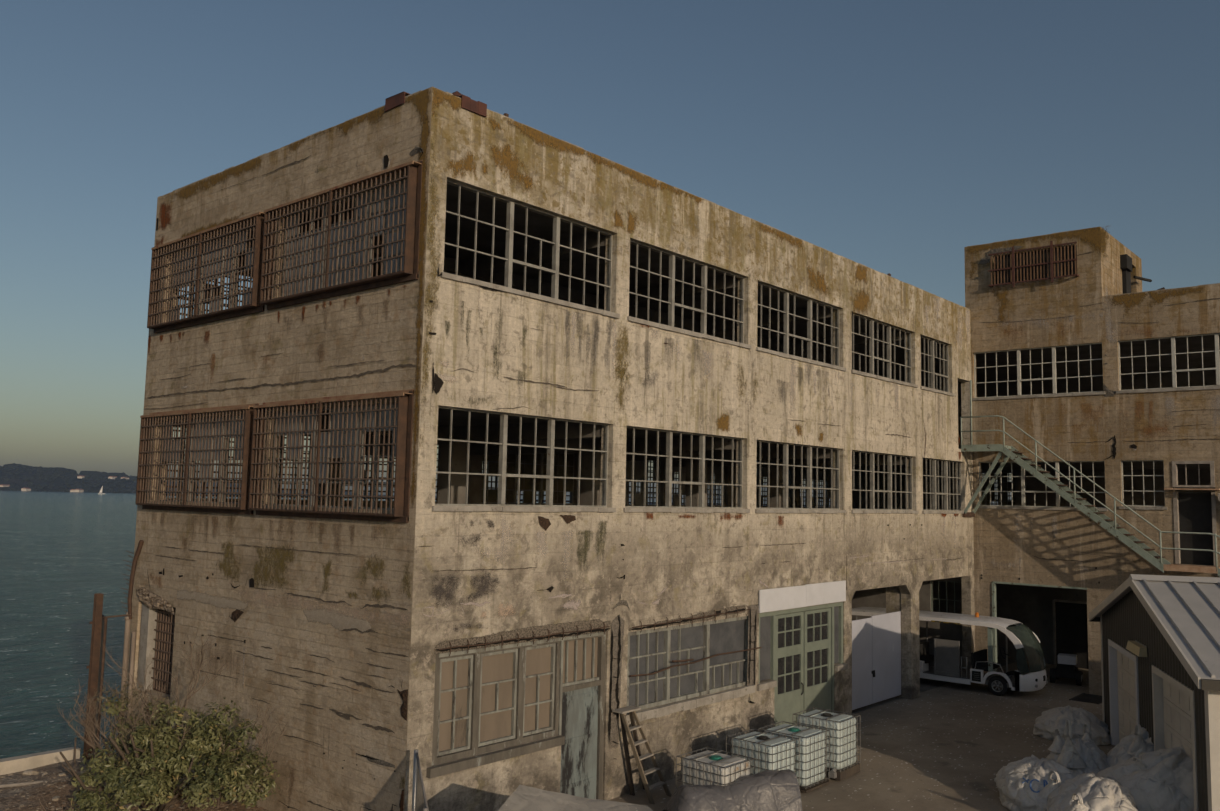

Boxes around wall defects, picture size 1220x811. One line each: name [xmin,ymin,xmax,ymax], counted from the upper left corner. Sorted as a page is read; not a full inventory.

corrosion [156,203,171,246]
spalling [432,363,444,394]
crack [493,377,599,410]
spalling [538,515,576,531]